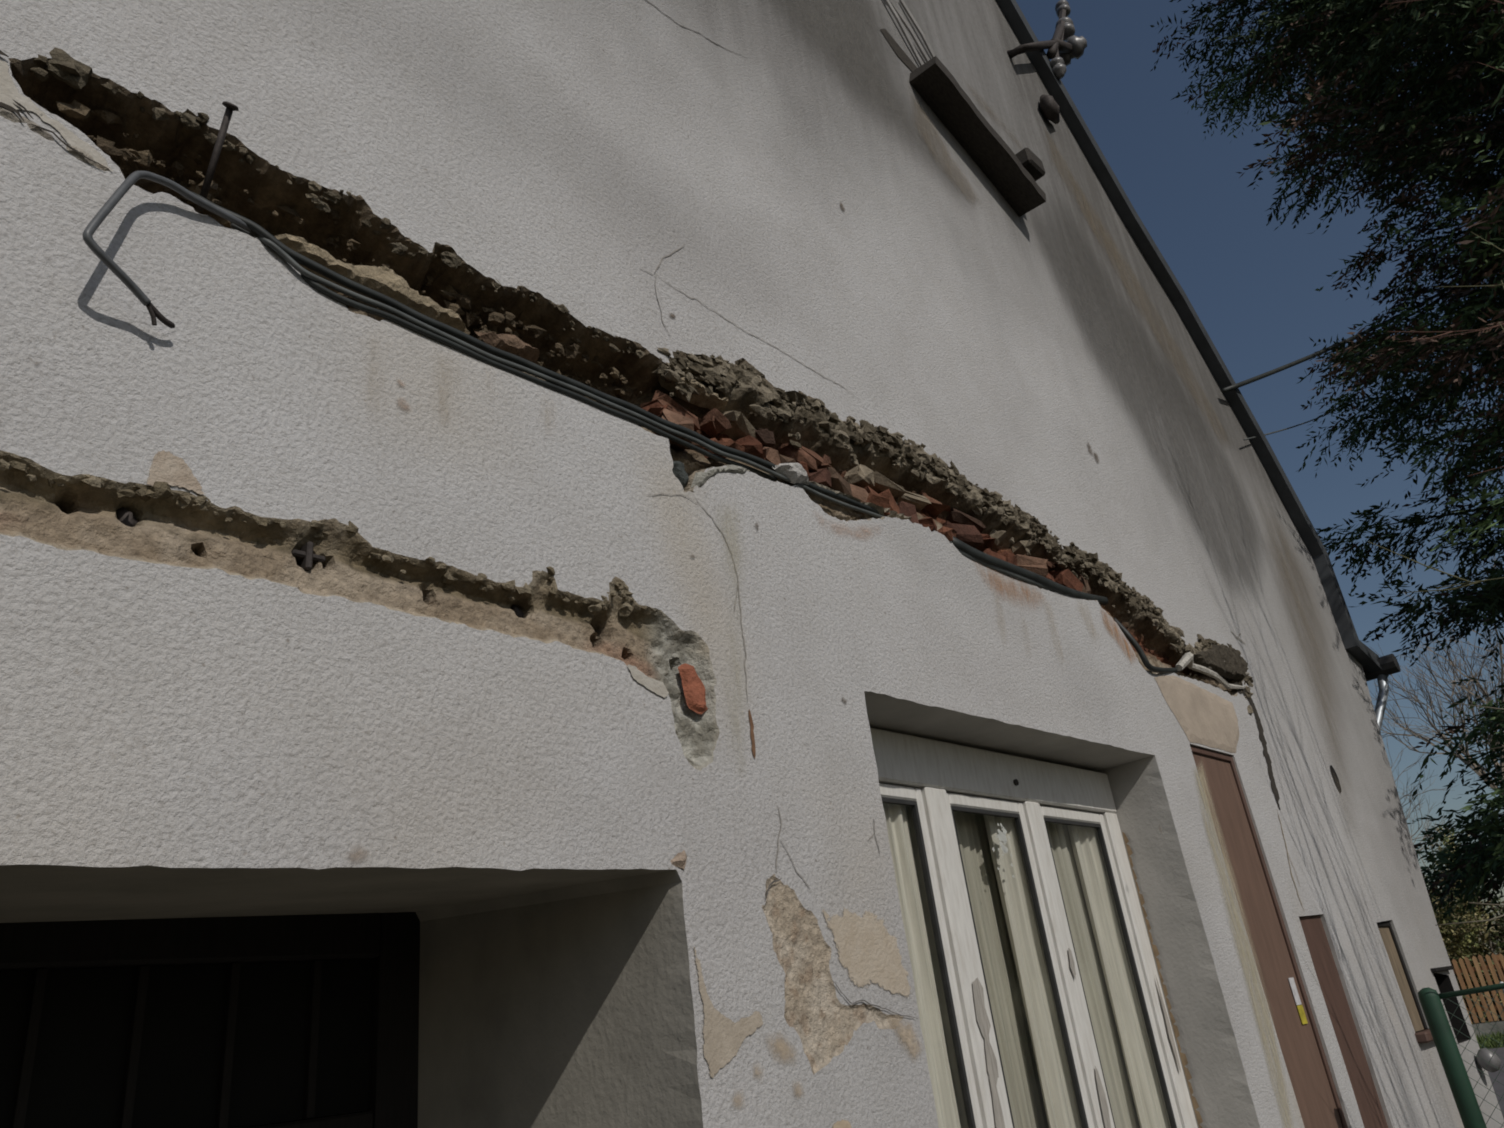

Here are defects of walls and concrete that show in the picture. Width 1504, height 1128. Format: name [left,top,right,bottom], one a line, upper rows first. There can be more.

crack [646,0,743,56]
spalling [0,47,1254,714]
crack [1234,682,1305,912]
peeling [694,947,763,1078]
peeling [762,874,919,1075]